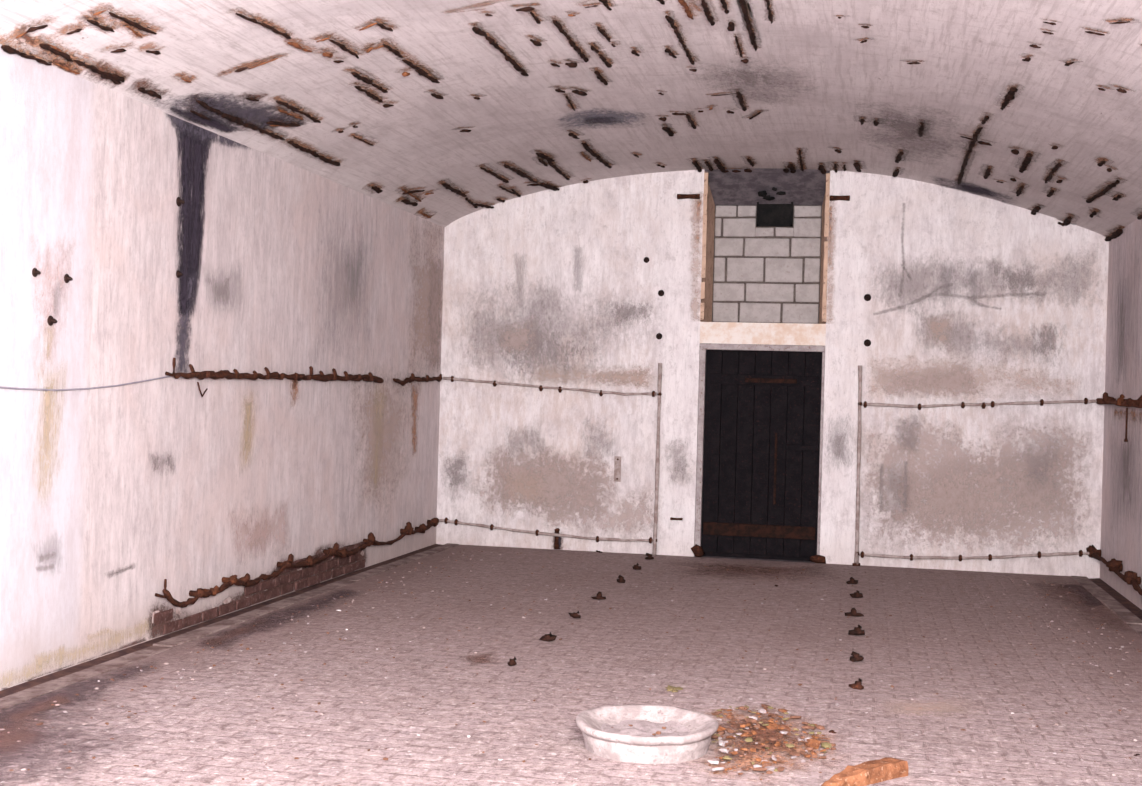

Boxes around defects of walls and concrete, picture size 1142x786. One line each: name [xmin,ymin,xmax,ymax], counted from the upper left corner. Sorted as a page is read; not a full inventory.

spalling [0,5,165,100]
spalling [220,8,447,108]
spalling [449,2,529,76]
spalling [513,0,643,85]
spalling [657,0,774,72]
spalling [175,73,340,166]
spalling [658,89,768,137]
spalling [955,85,1068,215]
spalling [1058,157,1123,226]
leakage [167,115,247,373]
leakage [480,448,653,531]
leakage [867,423,1086,547]